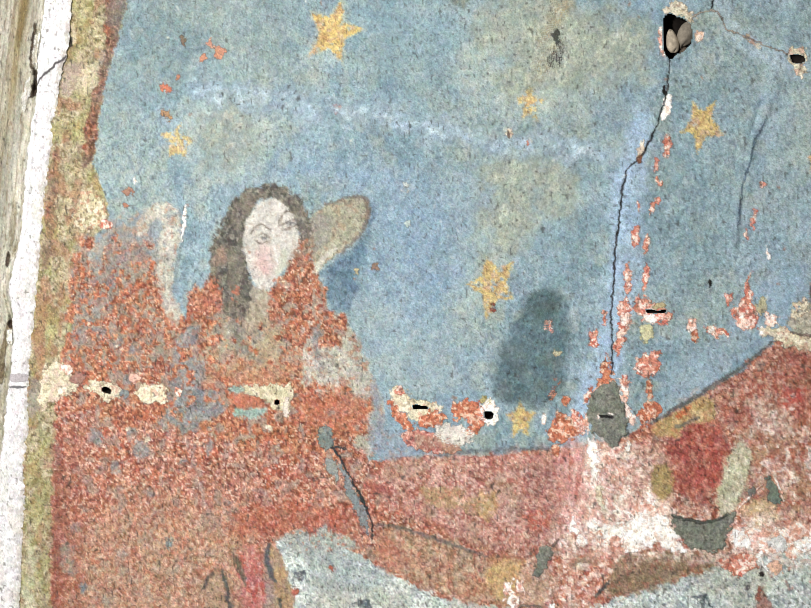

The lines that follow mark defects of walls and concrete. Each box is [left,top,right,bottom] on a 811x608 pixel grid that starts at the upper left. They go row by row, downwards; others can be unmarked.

crack [687,0,788,55]
peeling [654,134,673,186]
crack [737,121,765,228]
crack [609,59,672,375]
peeling [631,225,650,254]
leakage [494,291,568,403]
peeling [37,361,182,411]
peeling [244,382,294,417]
peeling [387,385,499,454]
peeling [541,263,673,510]